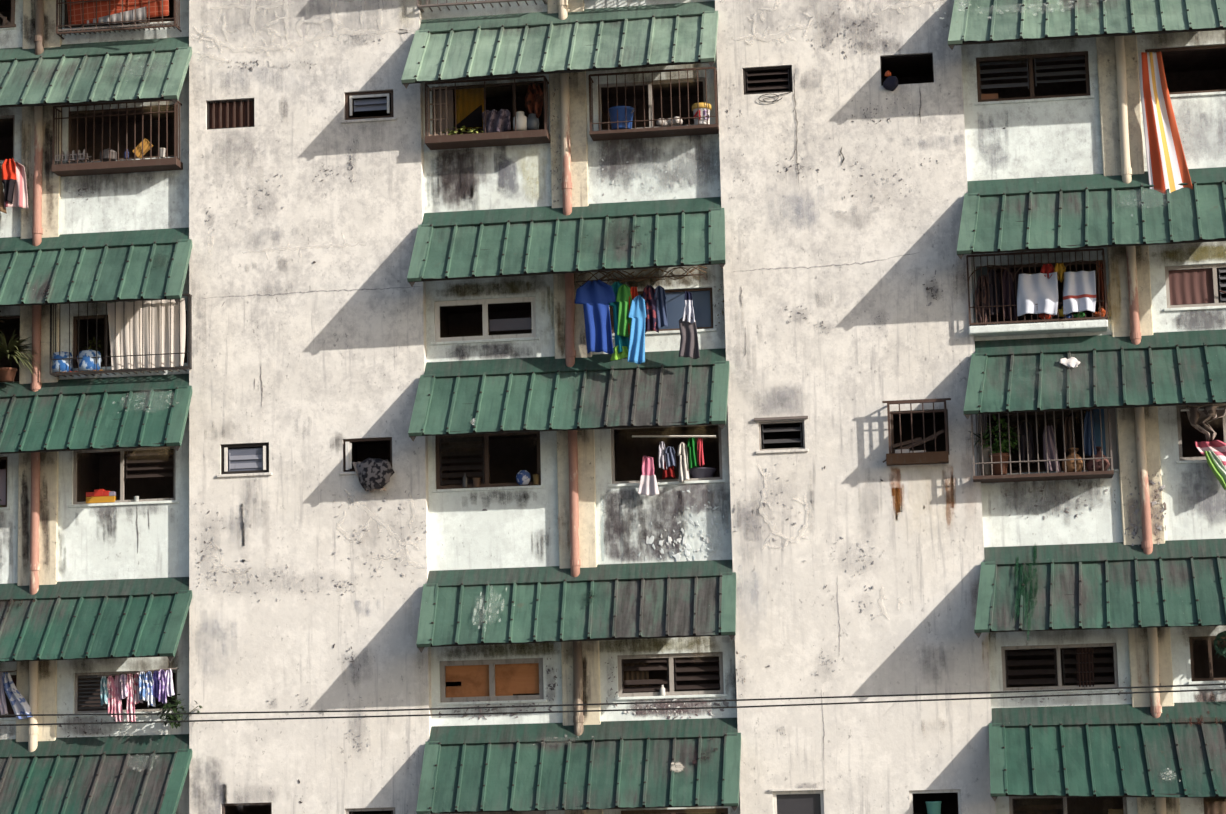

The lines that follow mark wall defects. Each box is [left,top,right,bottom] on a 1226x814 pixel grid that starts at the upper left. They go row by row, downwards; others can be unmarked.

leakage [438,148,484,205]
leakage [498,146,517,192]
leakage [602,137,662,180]
crack [790,74,799,184]
leakage [22,480,48,566]
leakage [601,483,725,561]